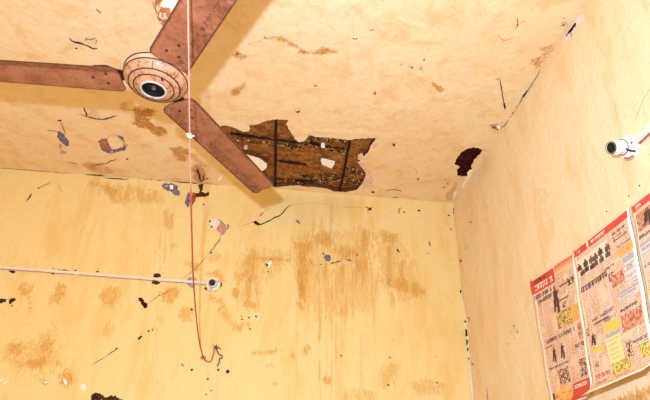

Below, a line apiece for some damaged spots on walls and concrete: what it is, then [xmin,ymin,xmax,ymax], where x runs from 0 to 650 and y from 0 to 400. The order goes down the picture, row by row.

crack [69,38,98,50]
crack [494,73,539,131]
peeling [48,120,75,154]
peeling [98,135,128,155]
spalling [221,119,379,192]
spalling [453,147,482,198]
peeling [209,219,229,235]
crack [237,203,323,228]